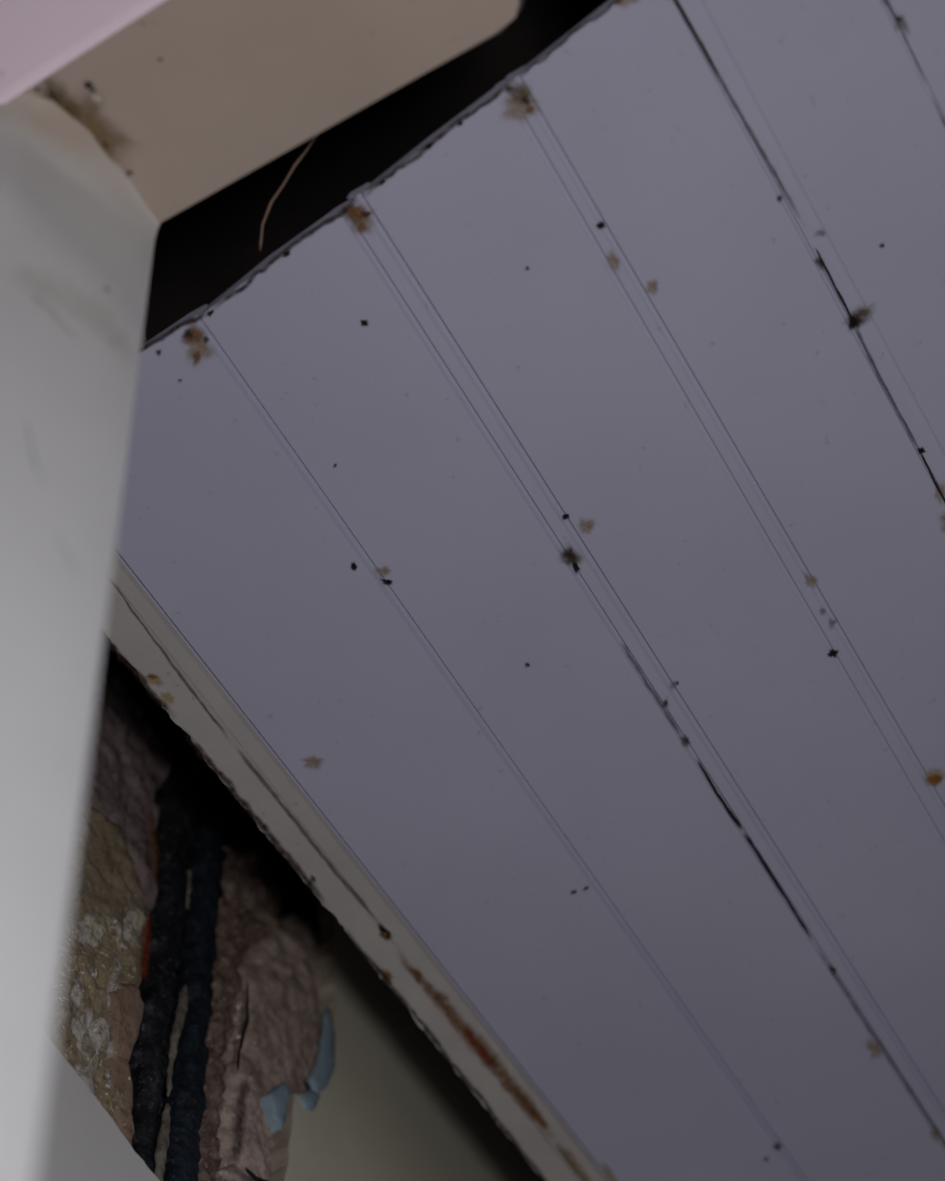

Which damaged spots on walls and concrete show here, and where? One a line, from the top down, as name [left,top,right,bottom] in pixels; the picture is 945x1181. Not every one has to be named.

rust [928,772,941,785]
spalling [53,649,173,1146]
spalling [154,970,189,1181]
spalling [198,844,335,1181]
rust [407,967,545,1127]